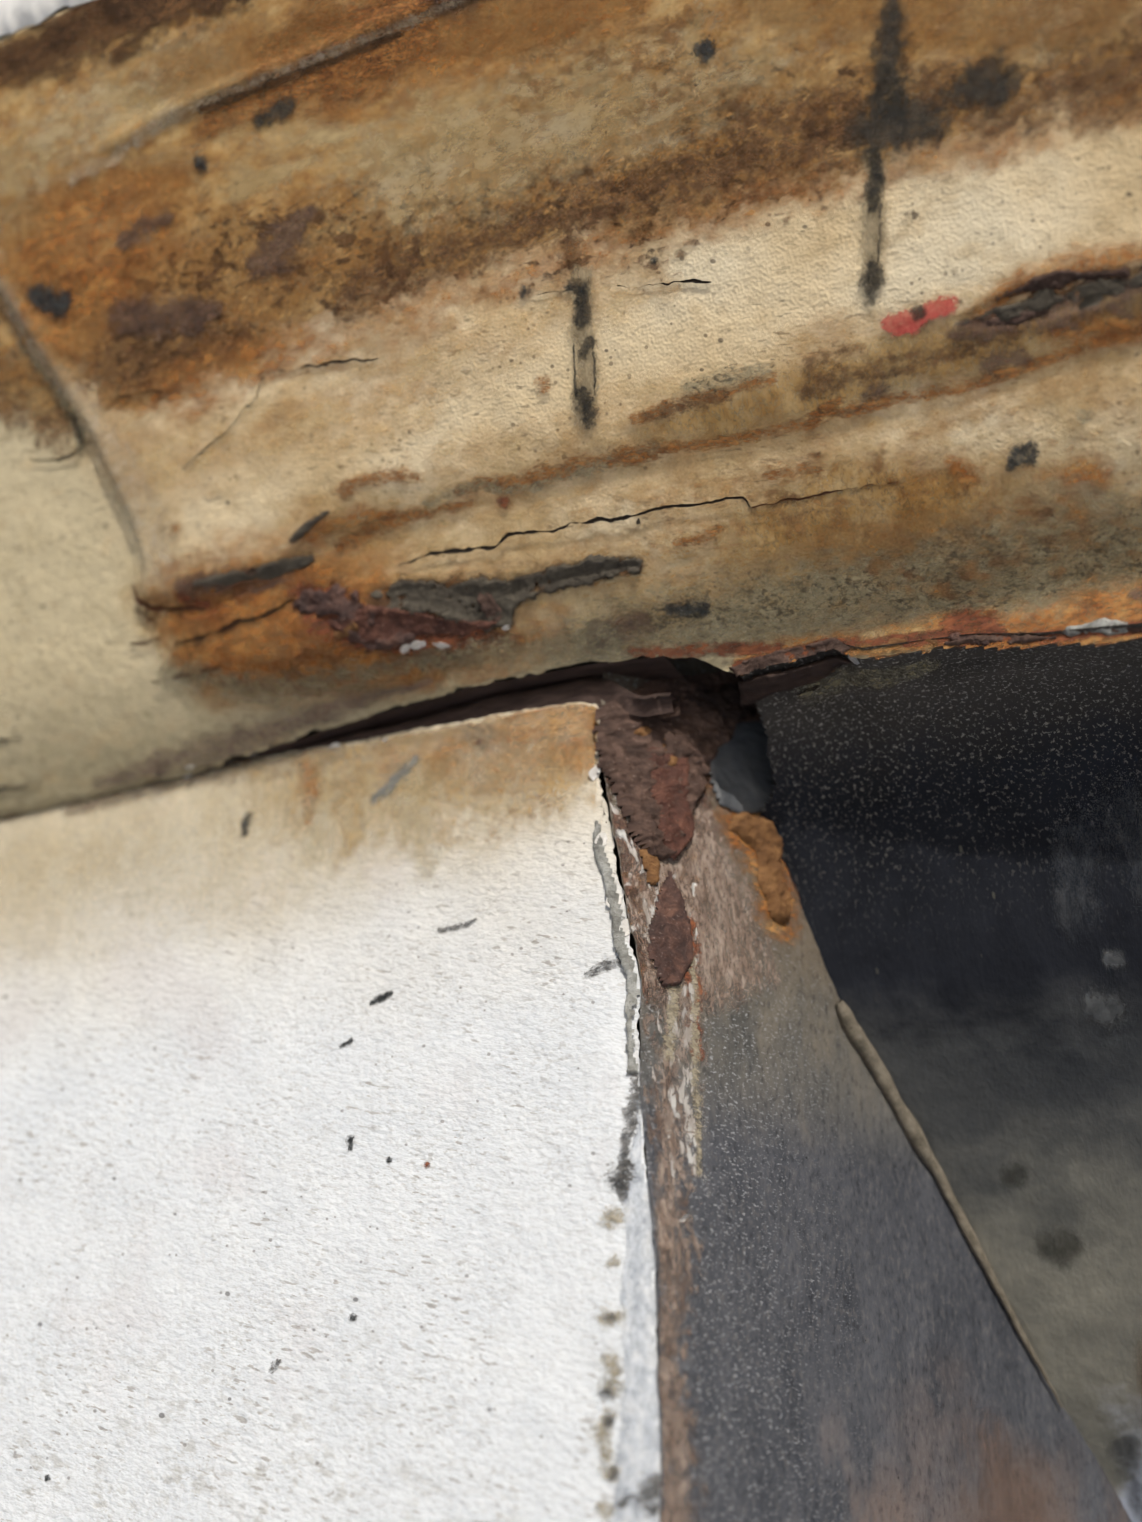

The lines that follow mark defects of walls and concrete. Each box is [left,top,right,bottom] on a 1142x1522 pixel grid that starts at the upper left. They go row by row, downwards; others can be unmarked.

corrosion [0,0,244,88]
corrosion [167,0,441,138]
water stain [0,0,1142,454]
spalling [951,266,1142,327]
crack [184,358,379,469]
spalling [174,510,644,657]
corrosion [66,238,1142,815]
crack [398,482,898,566]
crack [0,656,688,821]
spalling [709,721,773,814]
corrosion [594,582,1142,1522]